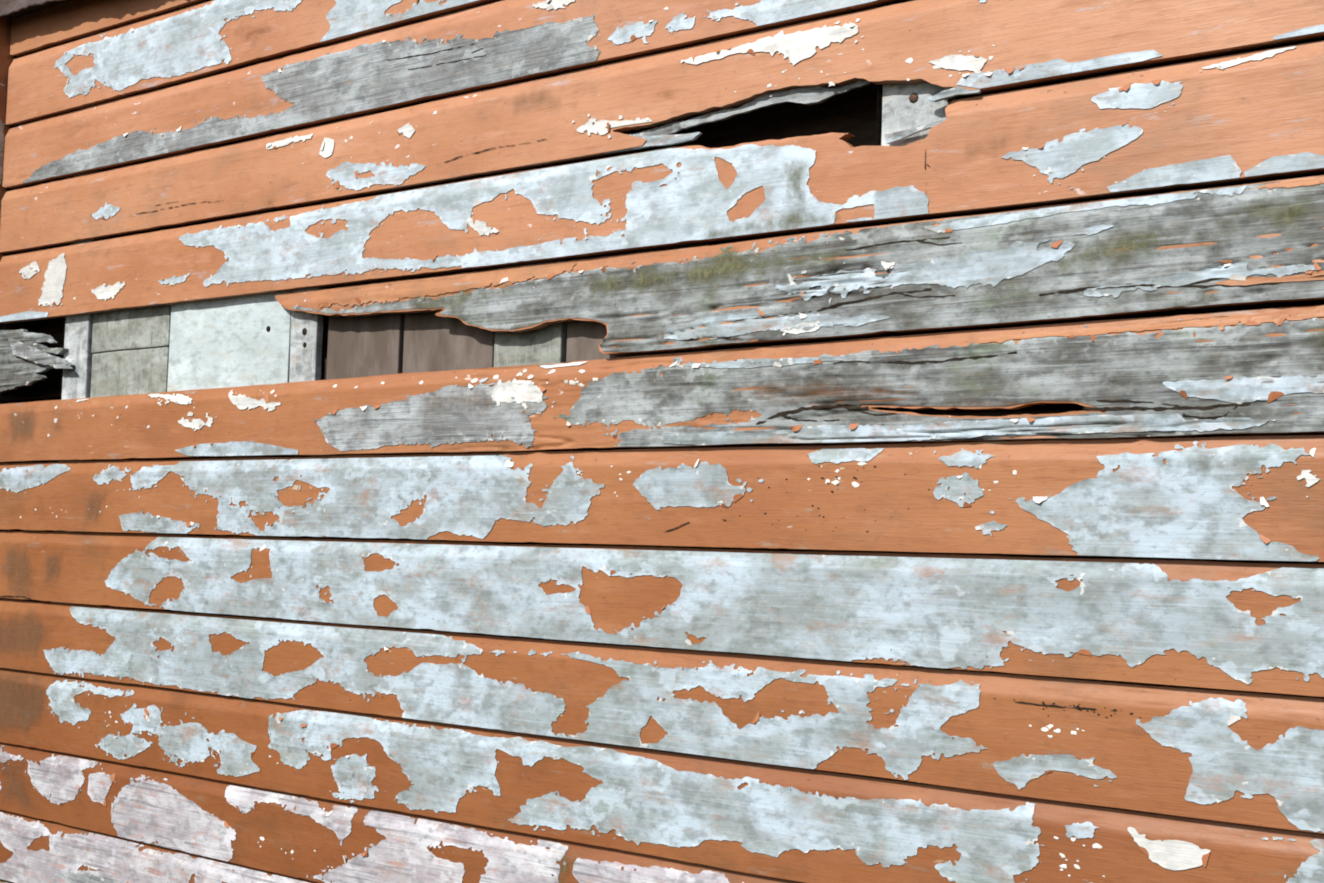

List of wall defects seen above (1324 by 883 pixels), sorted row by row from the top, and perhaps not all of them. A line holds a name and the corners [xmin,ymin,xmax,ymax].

peeling [23,0,1324,340]
peeling [0,253,76,322]
peeling [669,357,842,368]
crack [833,351,1017,364]
crack [756,404,906,424]
peeling [0,361,1324,883]